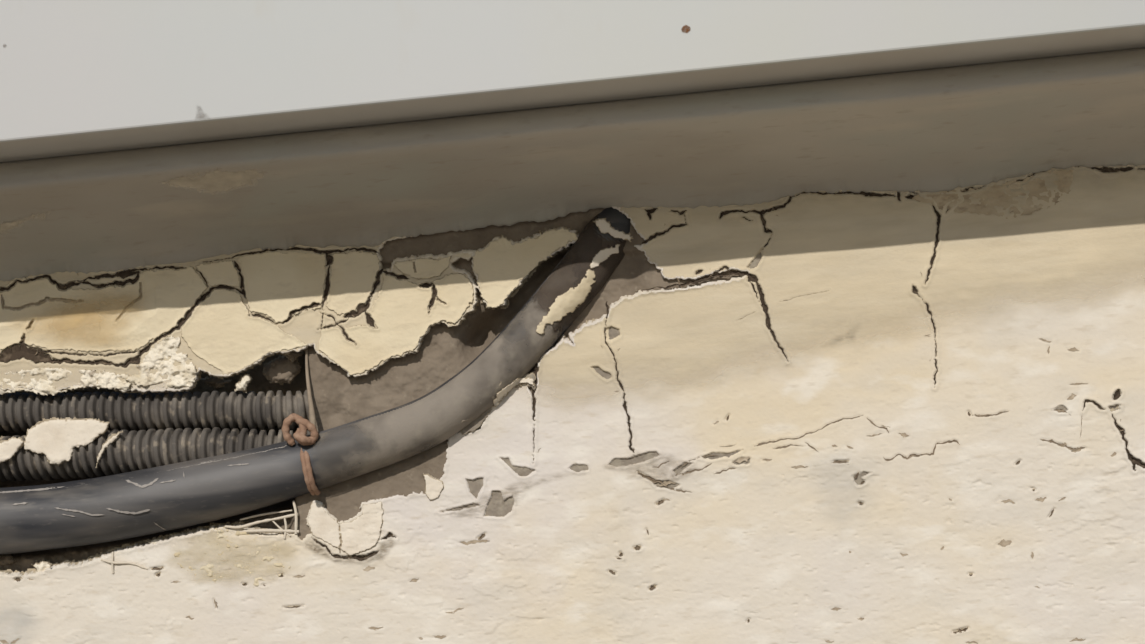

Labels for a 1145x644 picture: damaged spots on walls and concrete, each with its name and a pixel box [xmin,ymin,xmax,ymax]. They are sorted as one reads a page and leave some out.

crack [0,247,441,368]
flaking render [0,208,761,434]
crack [643,266,829,361]
crack [720,186,984,388]
crack [601,301,634,453]
flaking render [0,431,514,588]
peeling [501,458,535,476]
peeling [570,464,588,472]
peeling [610,452,691,504]
peeling [704,451,772,465]
crack [646,416,960,492]
crack [1045,390,1145,470]